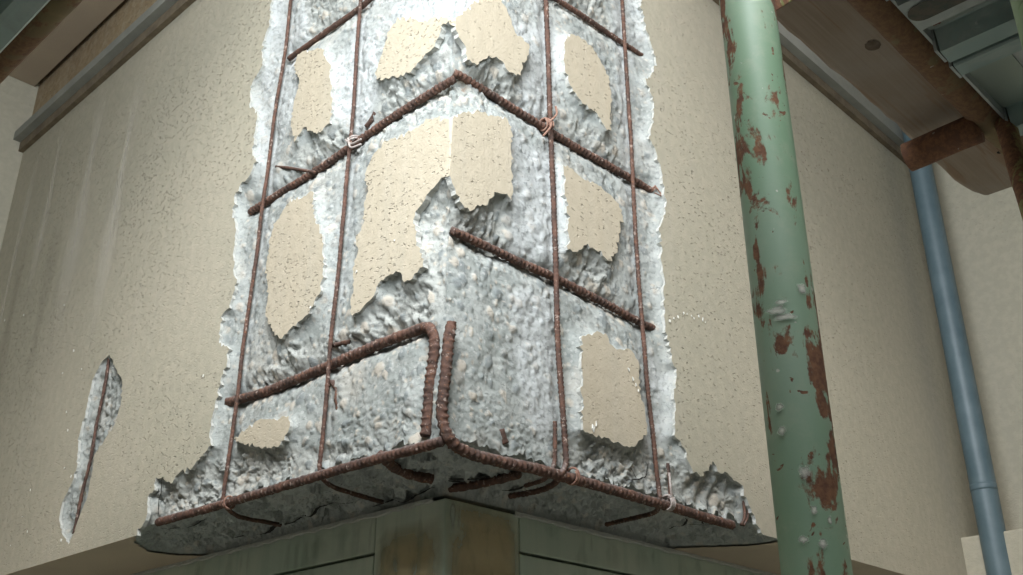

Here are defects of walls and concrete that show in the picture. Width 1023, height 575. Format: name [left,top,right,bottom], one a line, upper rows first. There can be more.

spalling [60,357,123,542]
spalling [134,0,778,556]